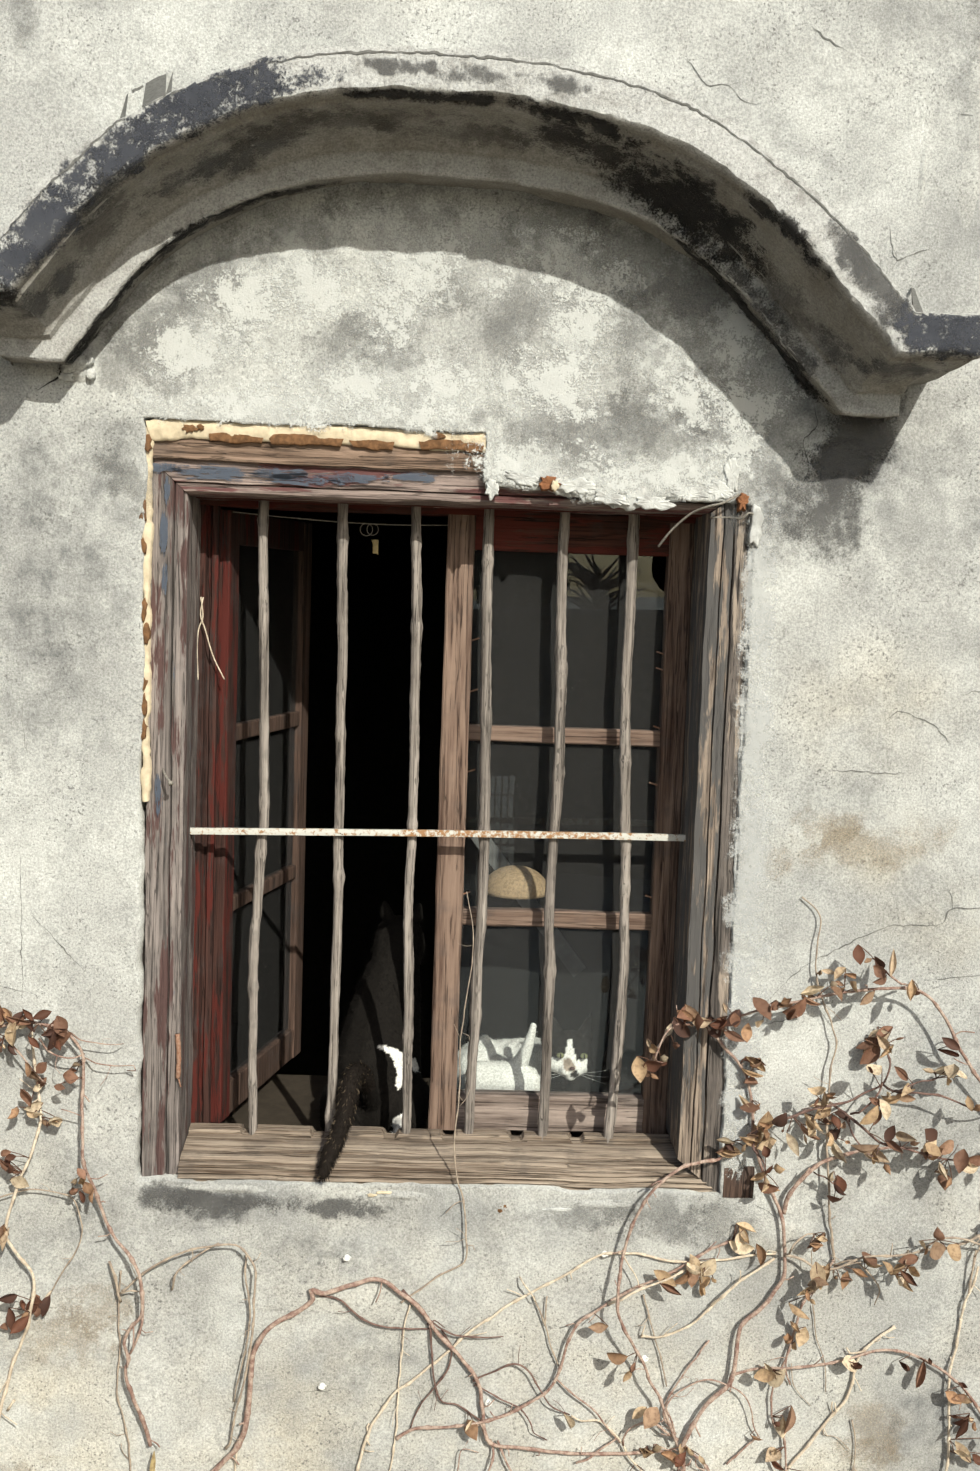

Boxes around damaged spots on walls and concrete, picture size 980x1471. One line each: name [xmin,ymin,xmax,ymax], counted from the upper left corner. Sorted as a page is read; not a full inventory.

peeling [125,205,808,815]
damp [0,46,980,559]
spalling [724,819,739,1087]